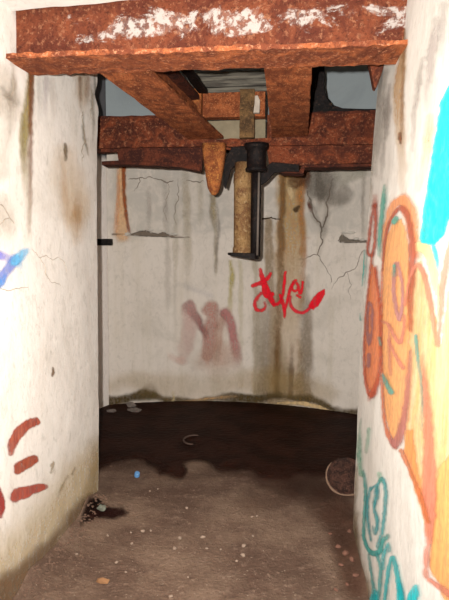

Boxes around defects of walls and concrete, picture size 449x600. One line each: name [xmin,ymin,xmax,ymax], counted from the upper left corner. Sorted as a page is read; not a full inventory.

corrosion [394,49,405,115]
corrosion [117,167,130,237]
crack [128,176,203,223]
corrosion [278,166,312,277]
water stain [307,170,333,197]
crack [302,179,364,297]